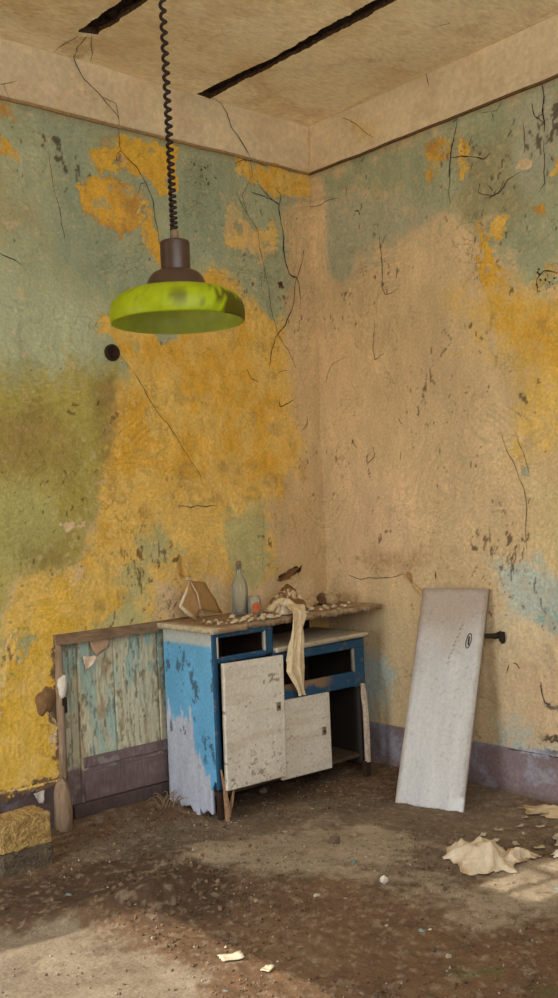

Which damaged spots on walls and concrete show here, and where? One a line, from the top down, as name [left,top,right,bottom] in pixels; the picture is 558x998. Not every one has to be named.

crack [54,35,159,242]
peeling [74,130,181,269]
peeling [220,192,280,267]
crack [211,97,304,382]
peeling [233,156,311,202]
peeling [342,112,385,151]
peeling [422,135,473,189]
peeling [0,266,313,805]
crack [502,436,529,536]
peeling [532,601,558,636]